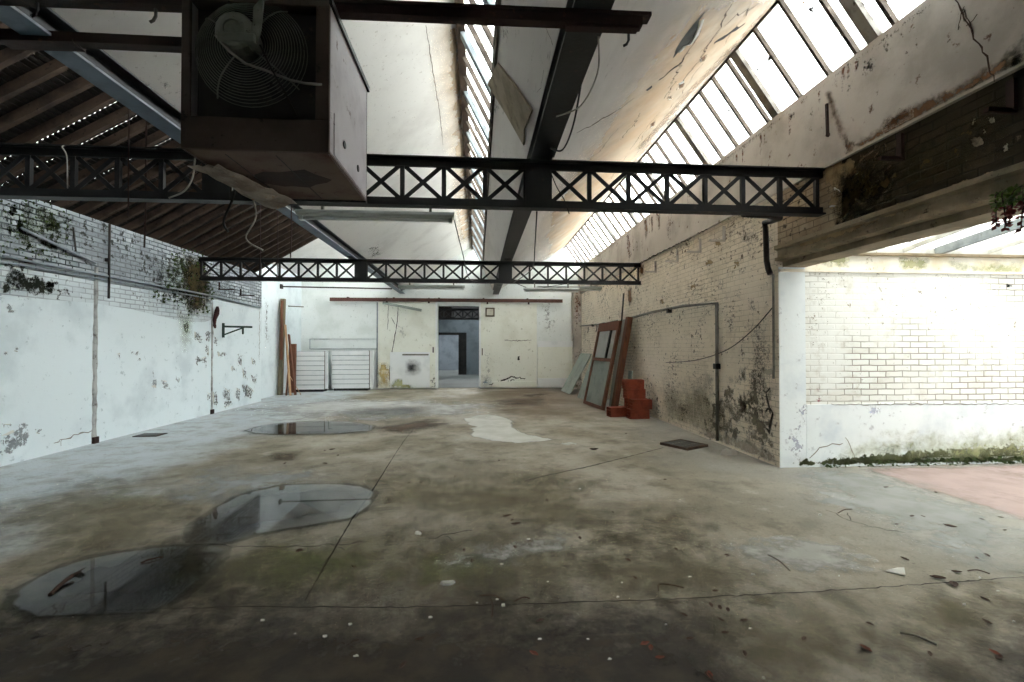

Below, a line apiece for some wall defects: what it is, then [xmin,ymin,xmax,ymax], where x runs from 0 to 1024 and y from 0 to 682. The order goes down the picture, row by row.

crack [955,0,995,82]
damp [857,59,1008,146]
peeling [184,323,256,407]
damp [702,327,773,451]
peeling [0,423,42,455]